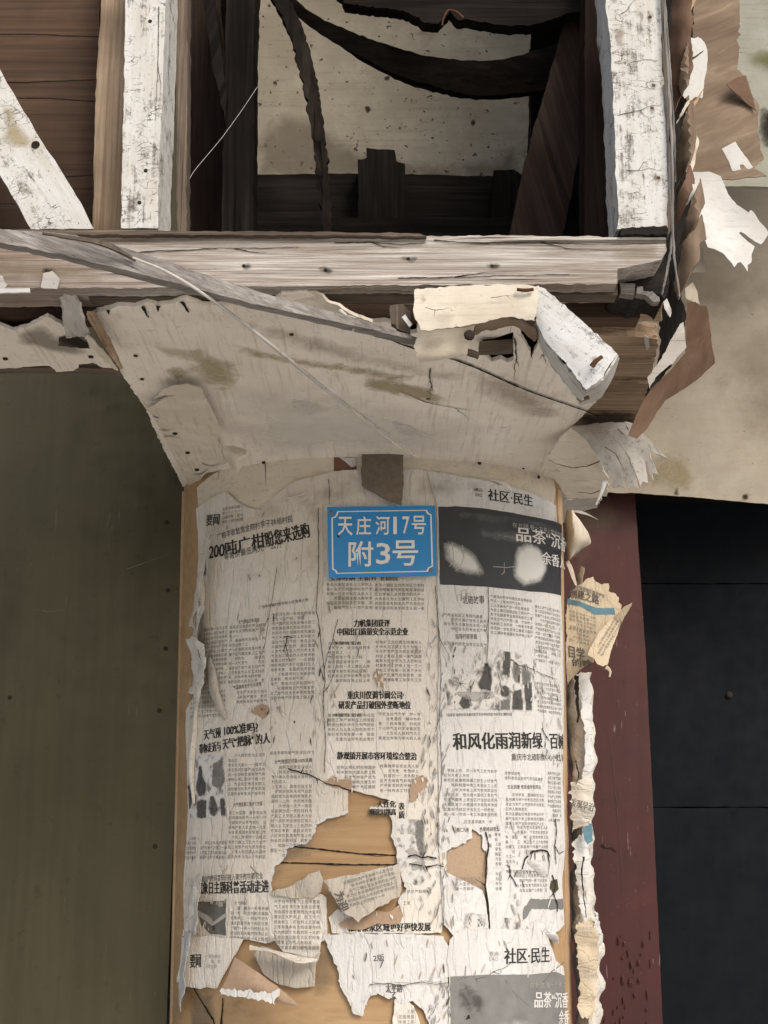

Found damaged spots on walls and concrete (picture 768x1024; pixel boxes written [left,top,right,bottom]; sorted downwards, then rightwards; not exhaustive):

peeling [669,0,707,304]
spalling [58,311,123,369]
crack [281,586,448,931]
peeling [446,829,487,897]